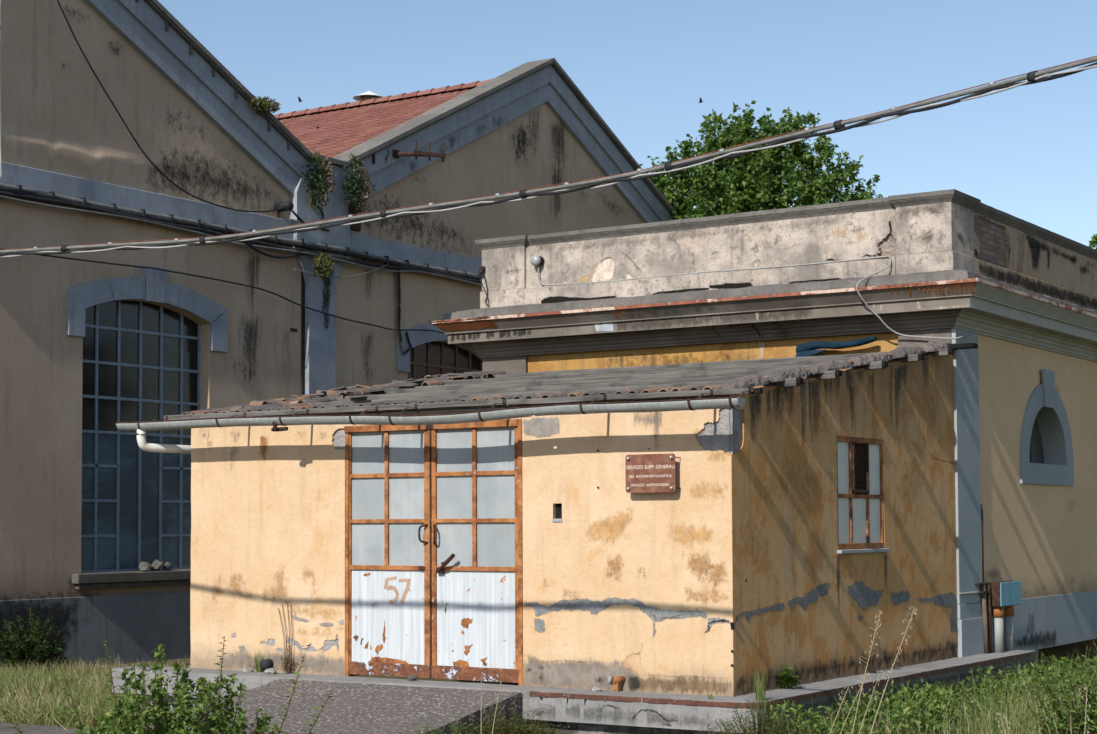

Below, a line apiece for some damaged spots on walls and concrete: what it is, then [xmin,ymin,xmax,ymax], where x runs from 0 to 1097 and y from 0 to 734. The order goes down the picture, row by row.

damp [153,151,269,206]
crack [825,221,892,261]
damp [979,232,1097,309]
damp [244,322,258,381]
damp [750,371,874,434]
flaking render [696,408,742,460]
flaking render [261,635,339,652]
corrosion [353,623,408,664]
corrosion [453,618,487,667]